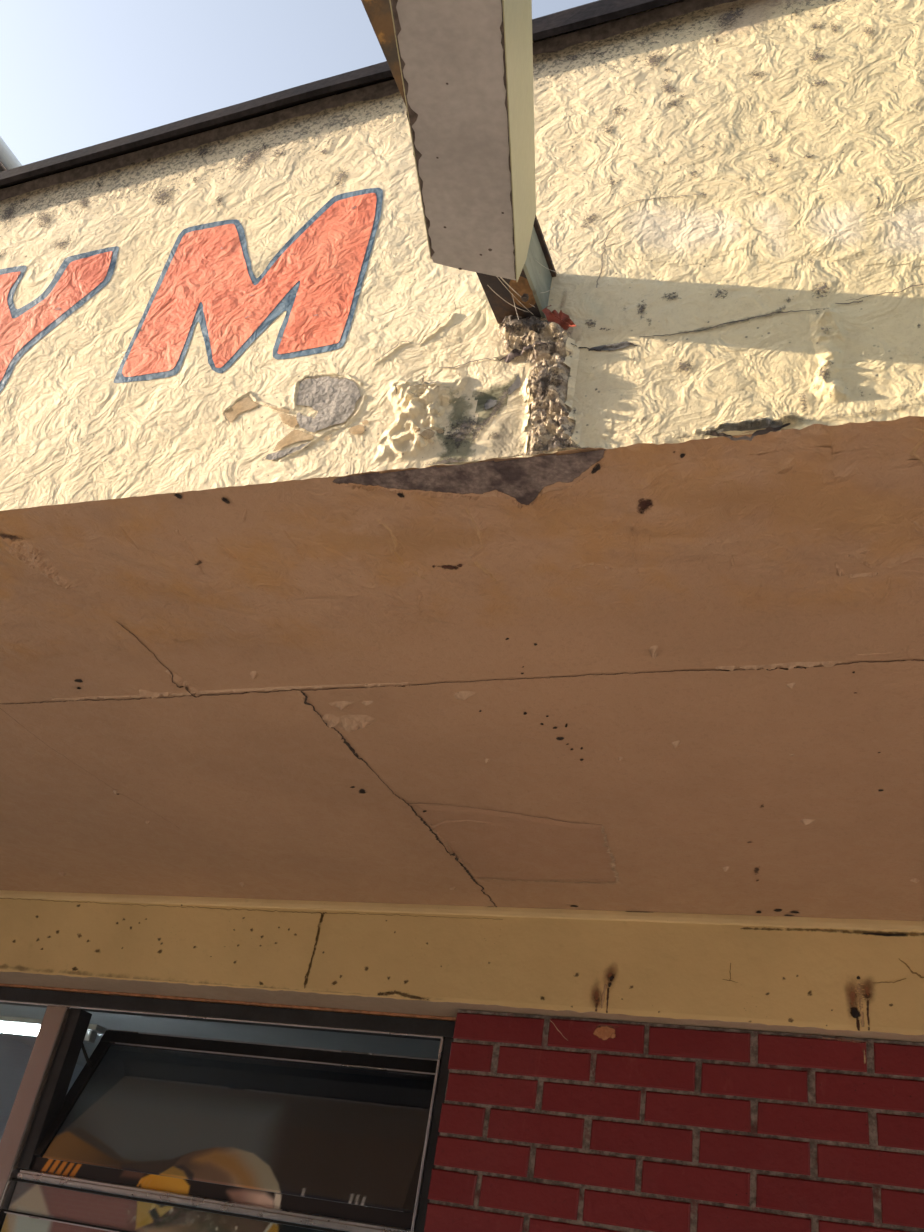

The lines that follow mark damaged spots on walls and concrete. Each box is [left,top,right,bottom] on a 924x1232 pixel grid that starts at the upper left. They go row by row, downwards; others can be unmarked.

water stain [693,0,831,48]
water stain [645,52,685,108]
crack [596,194,698,288]
crack [372,284,924,395]
peeling [221,373,368,462]
spalling [333,449,606,510]
crack [0,534,78,590]
crack [0,621,924,989]
corrosion [592,969,615,1013]
corrosion [848,976,872,1031]